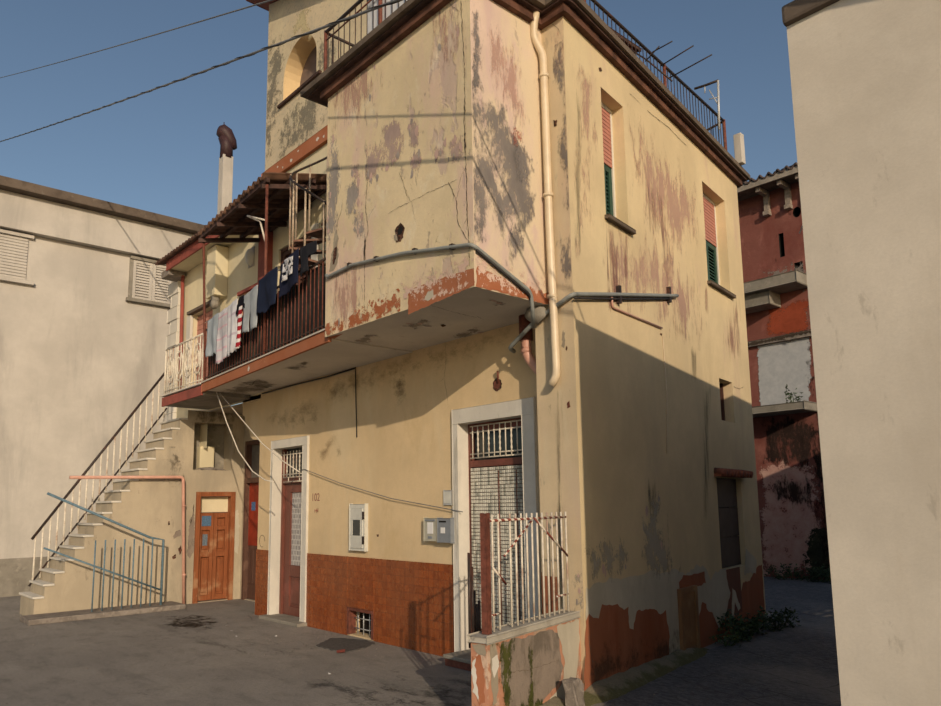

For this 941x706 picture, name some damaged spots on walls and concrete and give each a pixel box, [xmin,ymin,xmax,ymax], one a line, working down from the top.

damp [266,42,324,157]
damp [326,135,340,240]
crack [363,3,470,308]
damp [472,12,535,257]
peeling [325,255,549,335]
crack [748,329,811,346]
flaking render [760,458,830,579]
damp [765,413,830,578]
flaking render [471,540,740,706]